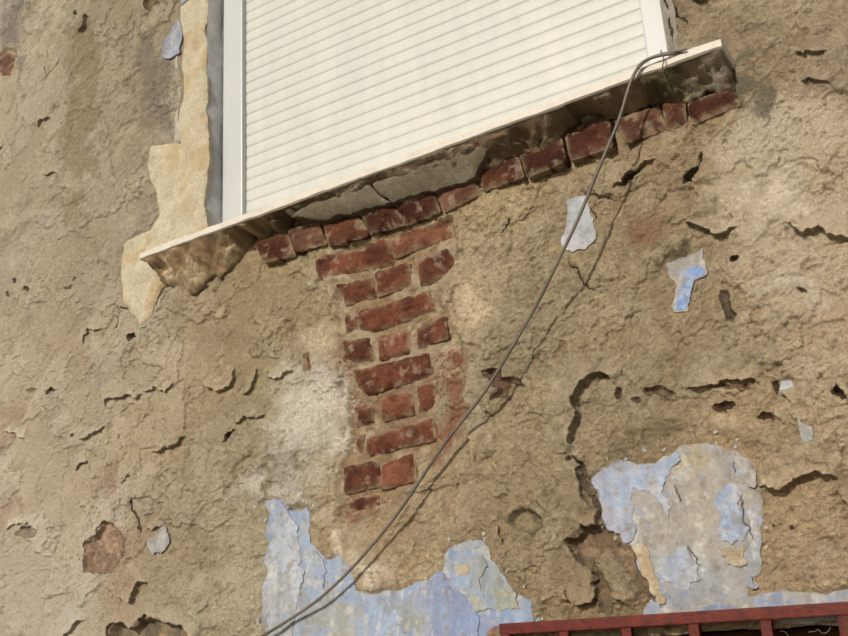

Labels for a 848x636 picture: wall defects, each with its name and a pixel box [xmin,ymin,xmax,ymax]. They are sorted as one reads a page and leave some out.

crack [583,191,616,220]
peeling [785,198,848,239]
flaking render [254,90,741,519]
crack [568,259,601,291]
crack [123,475,142,538]
peeling [250,345,848,636]
flaking render [78,507,206,636]
peeling [49,599,86,636]